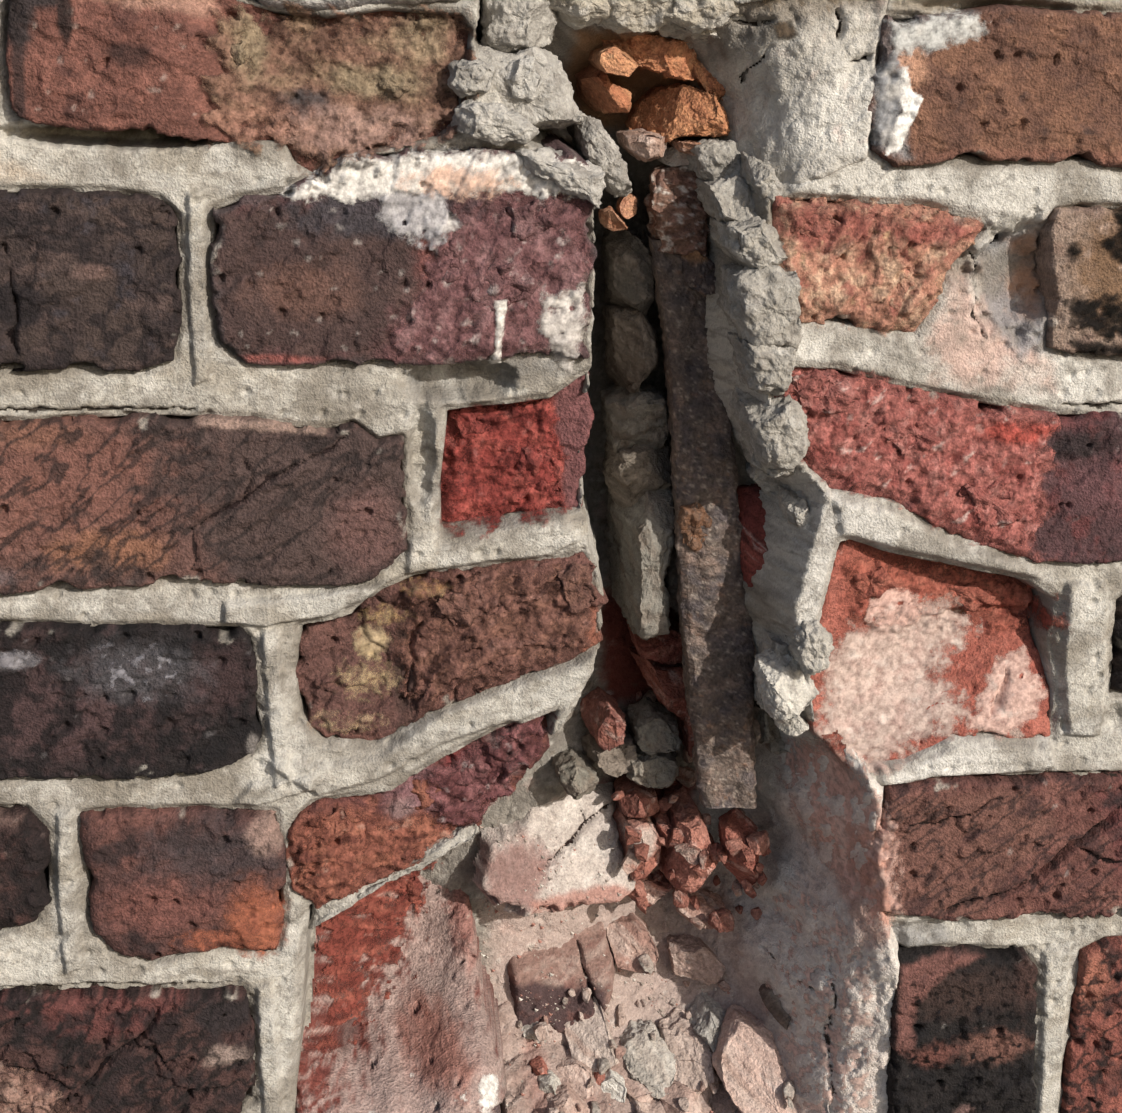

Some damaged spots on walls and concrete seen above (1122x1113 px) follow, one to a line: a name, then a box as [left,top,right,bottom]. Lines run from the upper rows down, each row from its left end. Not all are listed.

spalling [391,197,594,365]
corrosion [680,250,716,295]
spalling [778,198,983,334]
spalling [440,399,571,537]
corrosion [676,503,712,552]
spalling [784,368,1061,555]
spalling [392,562,598,709]
spalling [291,712,557,1054]
crack [547,804,609,861]
spalling [759,984,791,1030]